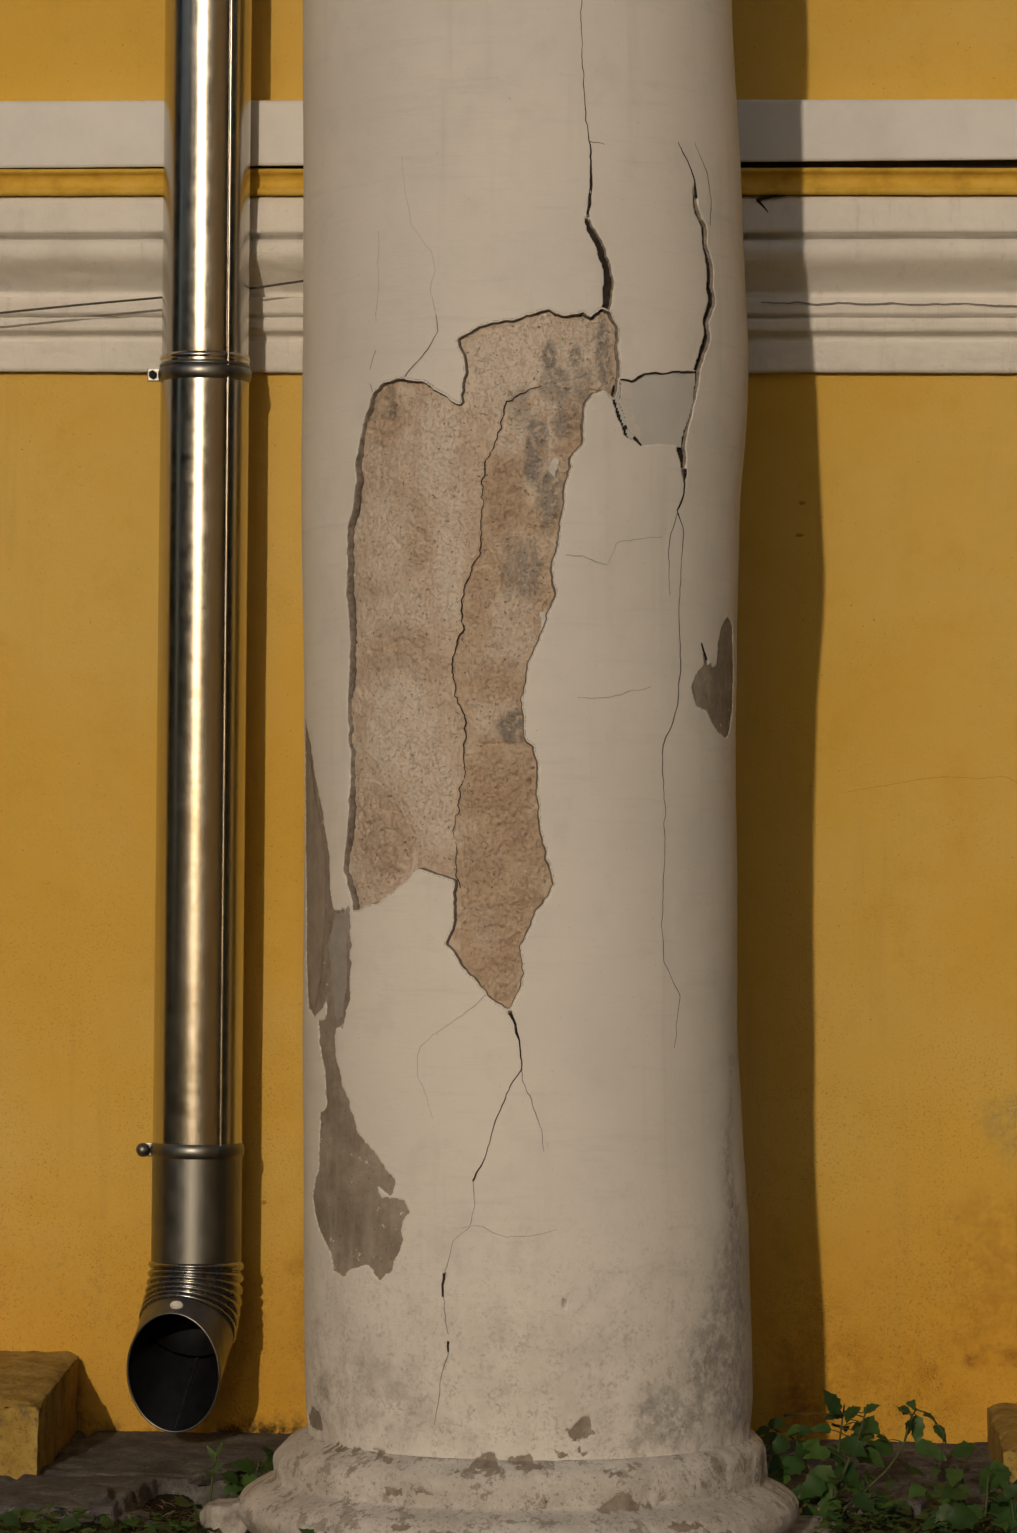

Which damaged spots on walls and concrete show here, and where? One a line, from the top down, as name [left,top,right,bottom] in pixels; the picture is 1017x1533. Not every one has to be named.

crack [580,4,612,309]
crack [756,195,785,213]
crack [761,300,1017,308]
crack [566,142,712,1048]
peeling [692,618,733,738]
flaking render [306,307,621,1280]
crack [417,994,558,1425]
peeling [454,1416,595,1477]
peeling [596,1469,652,1514]
peeling [668,1521,703,1532]